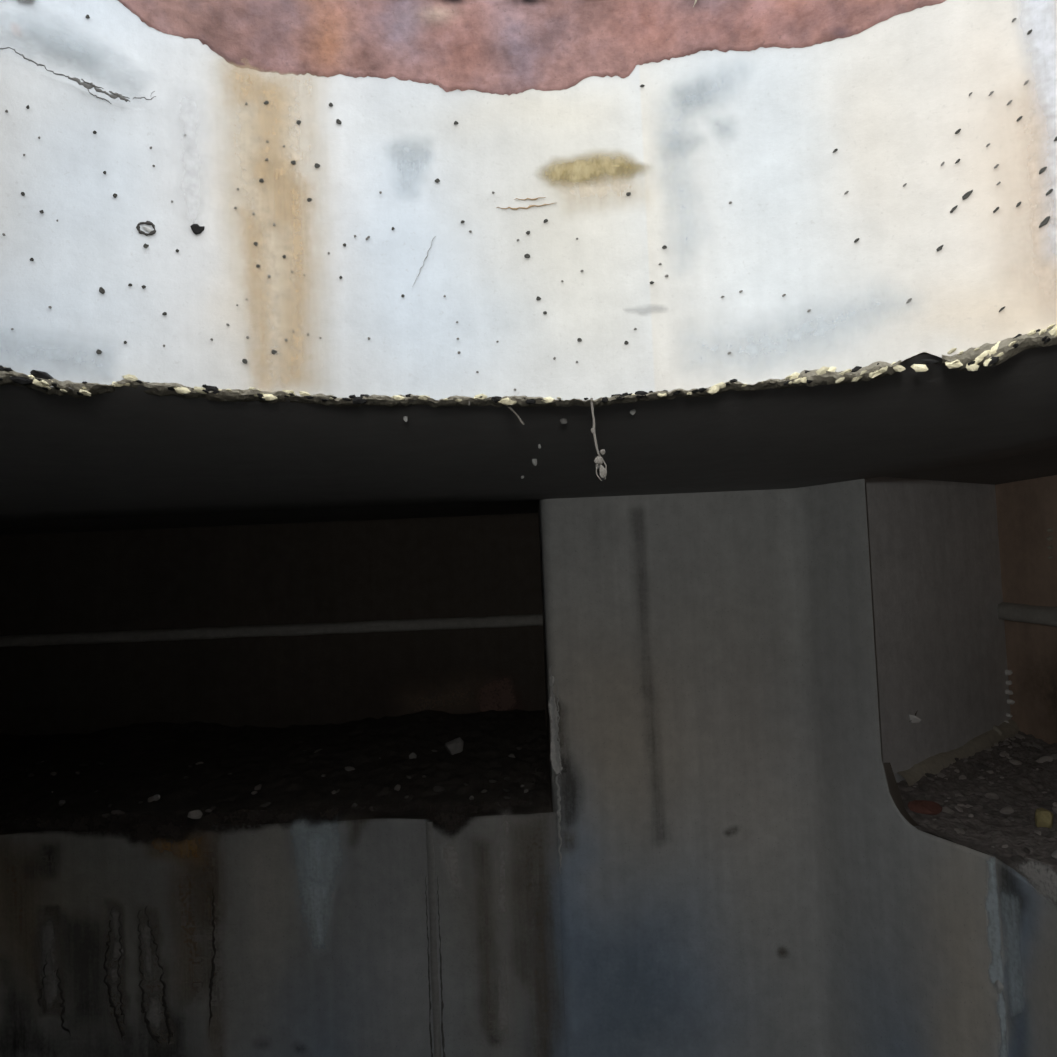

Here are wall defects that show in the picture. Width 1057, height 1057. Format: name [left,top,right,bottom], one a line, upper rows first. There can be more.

crack [0,47,156,104]
efflorescence [1025,0,1057,208]
rust [240,86,299,381]
spalling [0,324,1057,408]